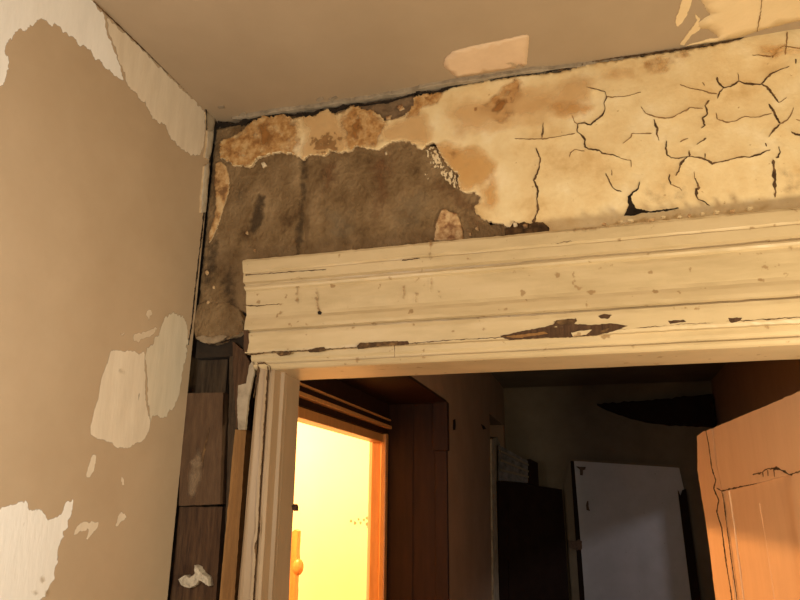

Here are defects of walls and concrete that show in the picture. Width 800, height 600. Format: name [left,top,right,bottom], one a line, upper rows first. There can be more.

peeling [0,0,205,156]
water stain [303,112,343,158]
spalling [199,35,640,313]
crack [515,32,800,223]
peeling [676,0,800,46]
peeling [90,309,188,449]
spalling [501,314,626,340]
peeling [0,499,99,600]